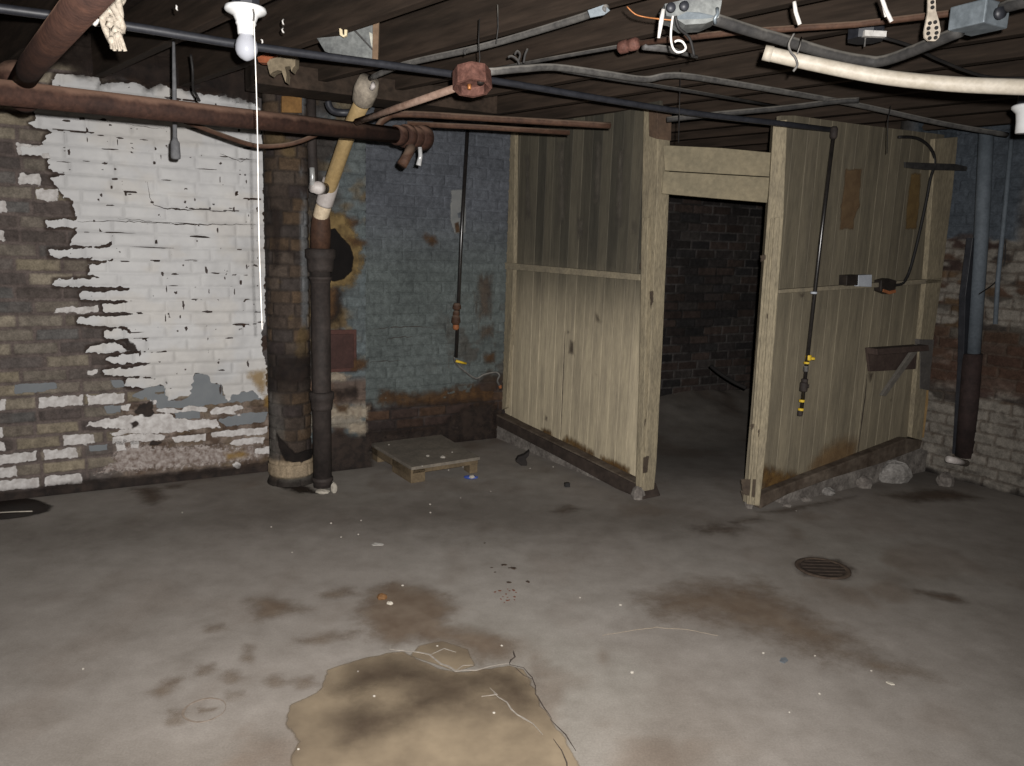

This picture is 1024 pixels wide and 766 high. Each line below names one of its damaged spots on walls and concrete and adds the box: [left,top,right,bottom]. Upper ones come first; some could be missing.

peeling [52,74,260,110]
peeling [0,109,312,491]
rust [378,385,493,404]
damp [286,641,579,766]
crack [391,648,576,766]